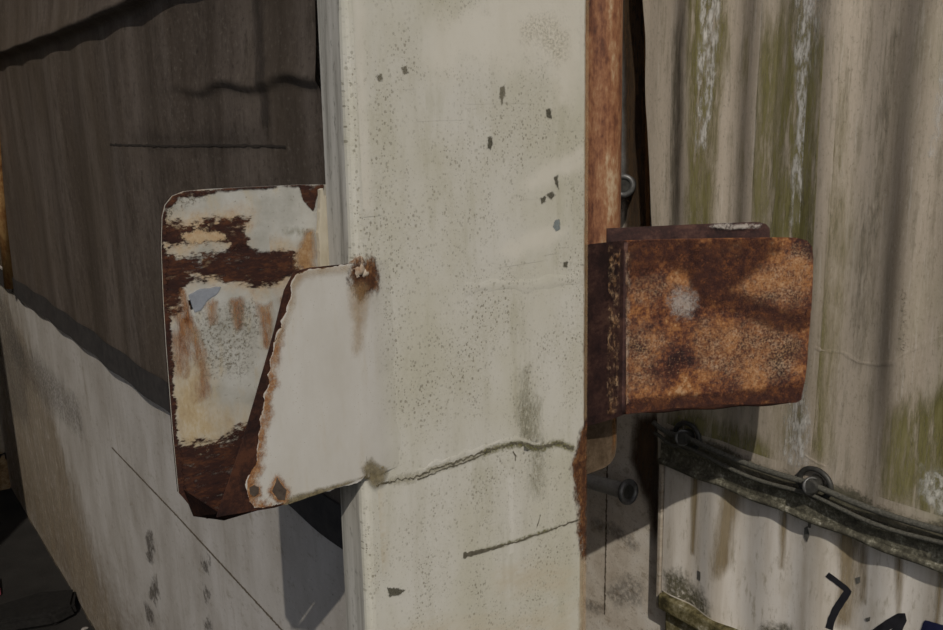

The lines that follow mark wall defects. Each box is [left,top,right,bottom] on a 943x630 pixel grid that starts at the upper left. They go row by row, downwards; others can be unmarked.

damp [698,0,720,146]
damp [792,0,820,201]
rust [346,256,380,301]
rust [161,185,324,519]
peeling [247,329,290,508]
crack [376,435,574,487]
rust [570,421,587,559]
rust [626,238,813,538]
damp [784,387,811,465]
damp [924,472,943,514]